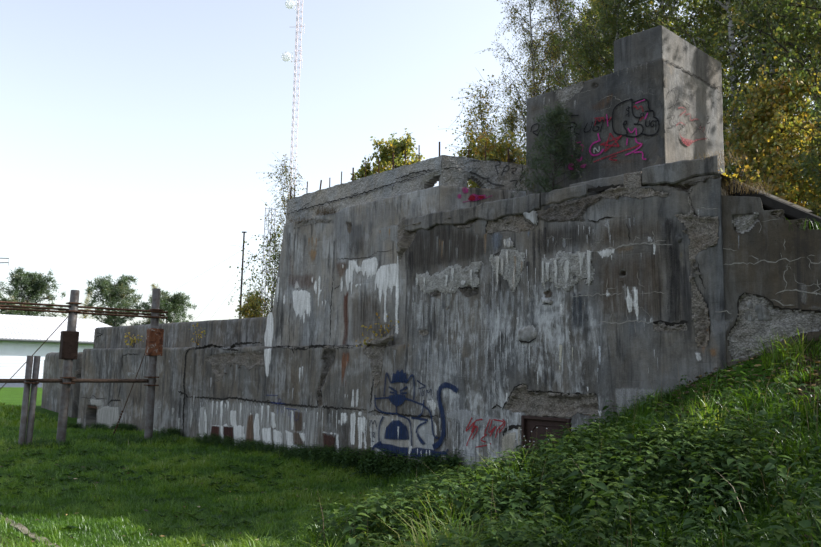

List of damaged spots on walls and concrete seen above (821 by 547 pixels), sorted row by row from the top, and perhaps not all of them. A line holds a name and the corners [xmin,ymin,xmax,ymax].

spalling [523,195,604,226]
crack [178,249,437,429]
spalling [459,288,478,297]
leakage [341,221,614,462]
spalling [662,175,720,347]
crack [718,239,821,337]
spalling [727,293,821,360]
spalling [504,384,598,417]